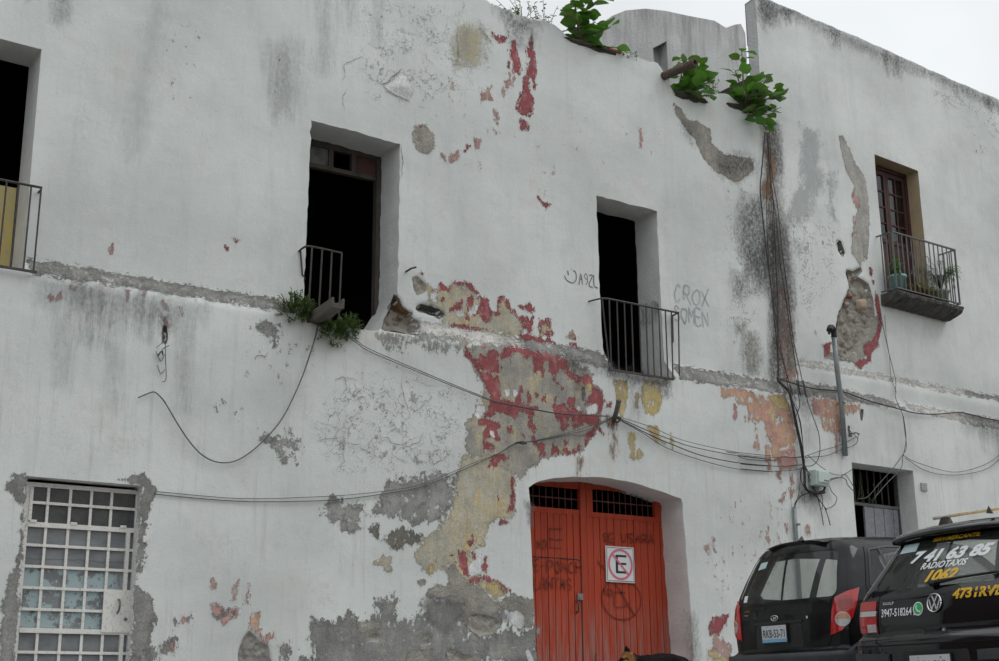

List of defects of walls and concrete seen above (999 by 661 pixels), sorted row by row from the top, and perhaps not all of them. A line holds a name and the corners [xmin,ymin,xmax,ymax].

peeling [478,31,538,135]
flaking render [673,103,754,182]
water stain [739,127,835,375]
peeling [210,272,673,661]
spalling [704,135,883,661]